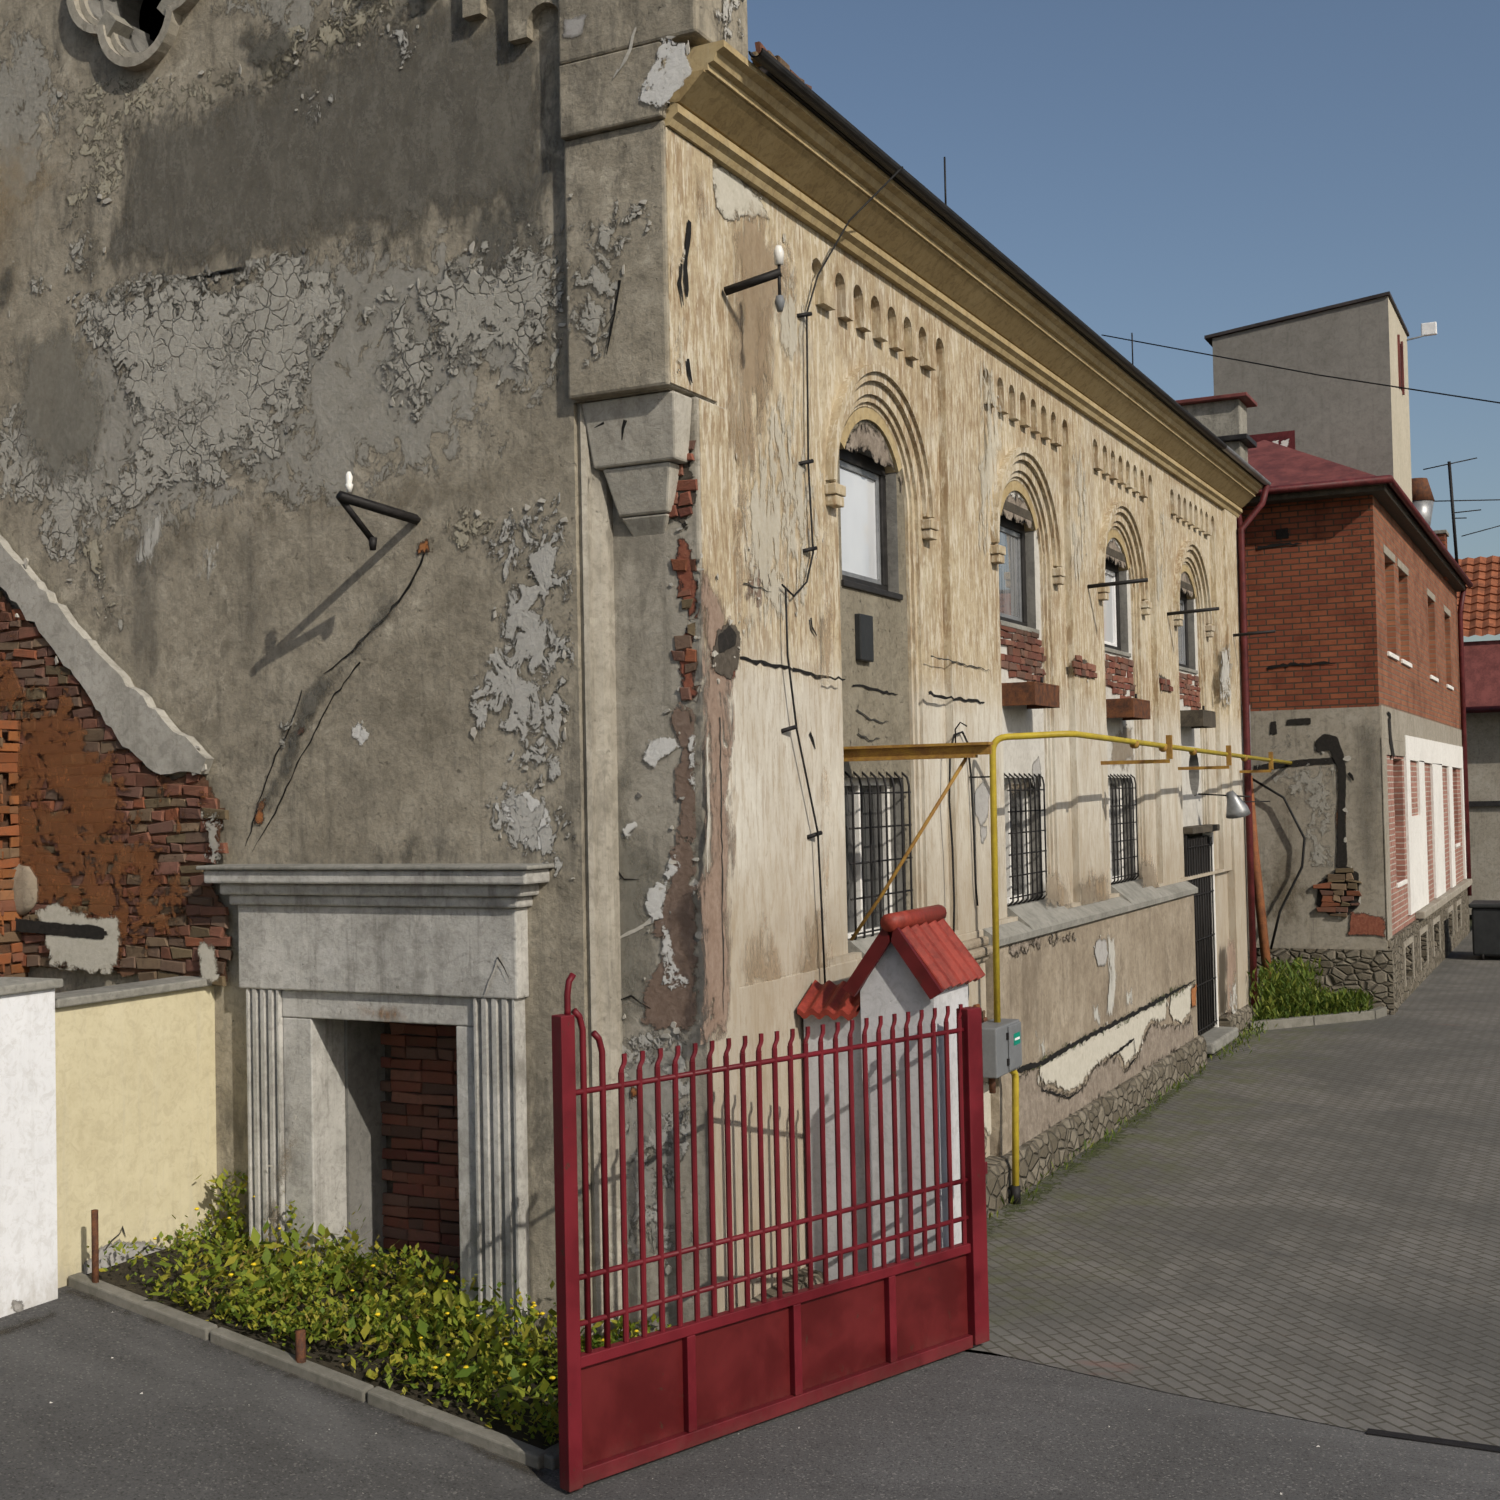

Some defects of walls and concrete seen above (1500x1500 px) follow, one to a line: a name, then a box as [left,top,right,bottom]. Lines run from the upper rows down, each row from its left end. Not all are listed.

flaking render [638,36,693,107]
peeling [0,0,652,986]
crack [245,552,425,852]
flaking render [1072,655,1097,682]
peeling [622,399,825,1275]
flaking render [1313,866,1386,938]
flaking render [1019,983,1197,1146]